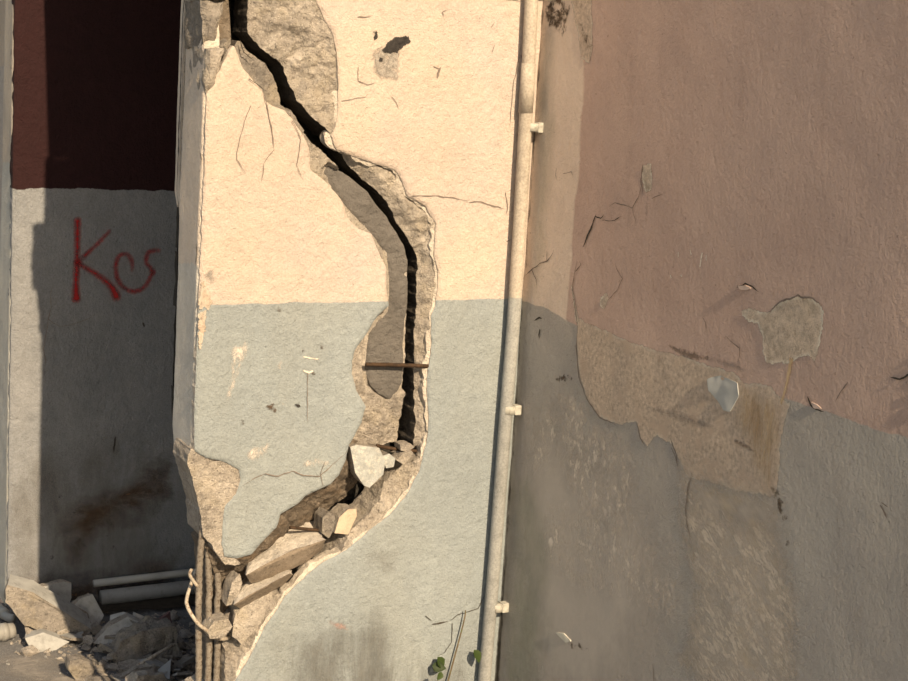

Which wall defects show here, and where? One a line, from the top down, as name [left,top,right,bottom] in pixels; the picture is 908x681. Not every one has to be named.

crack [229,0,345,179]
crack [413,192,508,211]
crack [572,185,662,321]
spalling [173,0,436,681]
crack [241,449,349,487]
crack [327,481,364,511]
crack [380,427,403,453]
peeling [529,286,824,681]